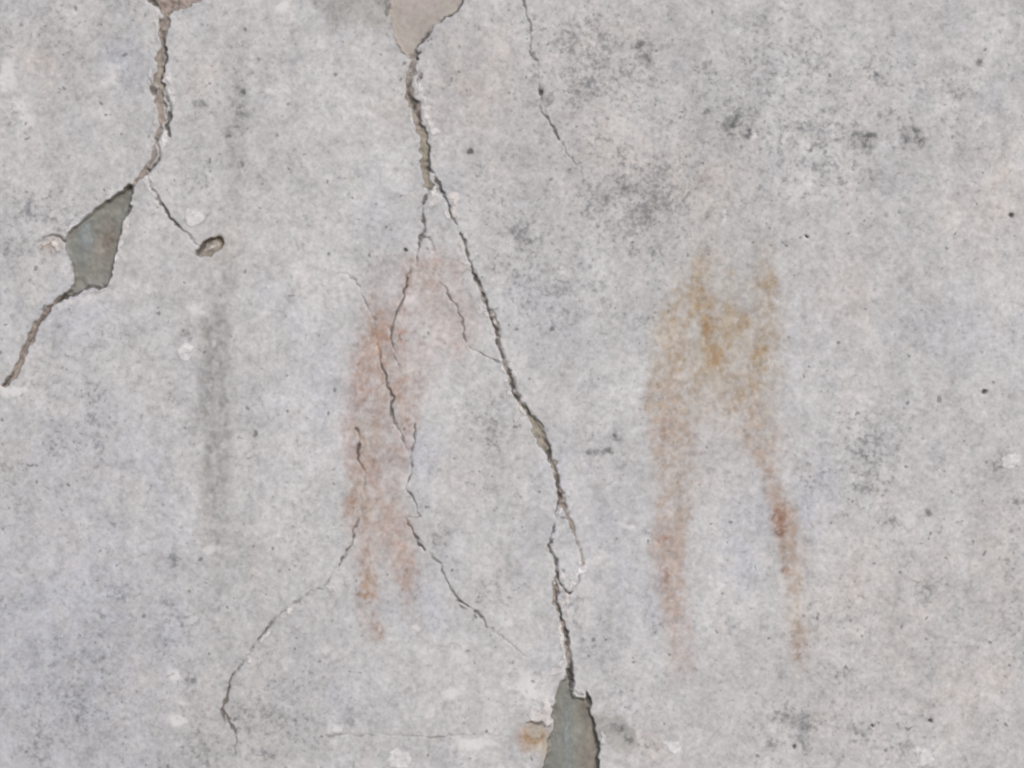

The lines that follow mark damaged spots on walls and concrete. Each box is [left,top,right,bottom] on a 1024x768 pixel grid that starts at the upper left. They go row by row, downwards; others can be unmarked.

spalling [388,0,463,60]
crack [125,0,201,228]
spalling [42,185,135,301]
crack [2,295,66,388]
crack [390,276,408,339]
crack [405,56,587,683]
crack [381,365,415,498]
crack [328,526,356,597]
crack [221,602,302,732]
spalling [528,669,606,768]